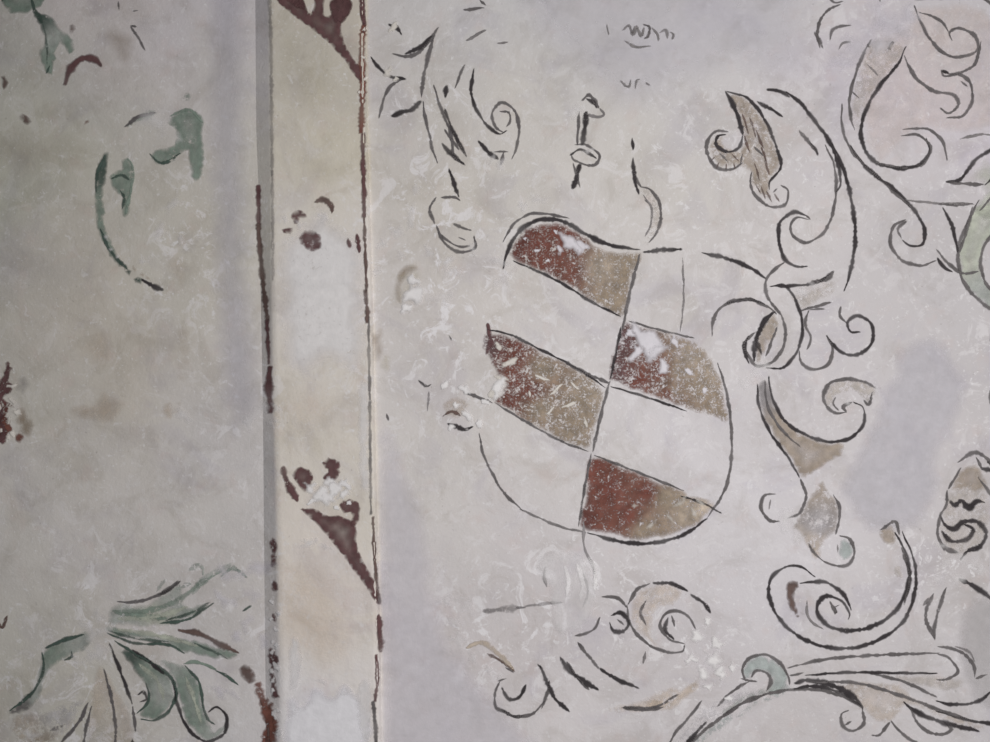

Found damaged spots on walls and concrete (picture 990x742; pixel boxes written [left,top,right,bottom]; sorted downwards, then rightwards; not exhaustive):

peeling [262,581,371,742]